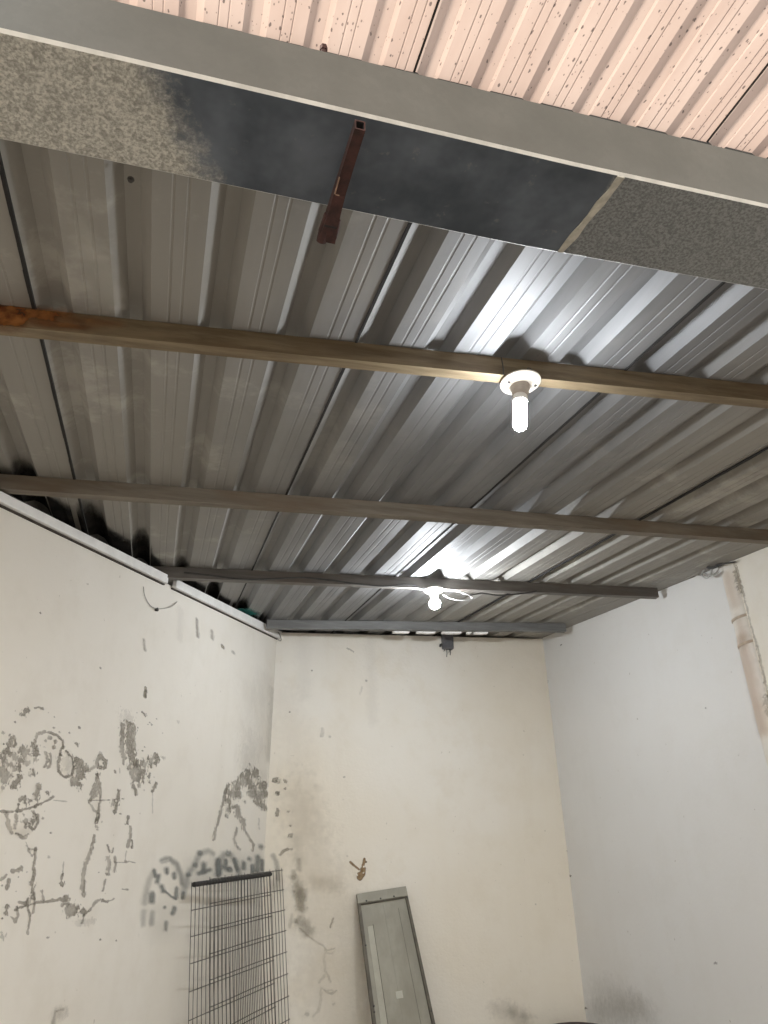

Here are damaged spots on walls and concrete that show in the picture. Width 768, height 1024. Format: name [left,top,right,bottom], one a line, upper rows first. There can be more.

rust [0,304,88,329]
leakage [0,462,36,476]
leakage [10,494,162,566]
leakage [183,581,261,620]
peeling [0,730,108,792]
peeling [111,719,160,849]
peeling [212,767,268,850]